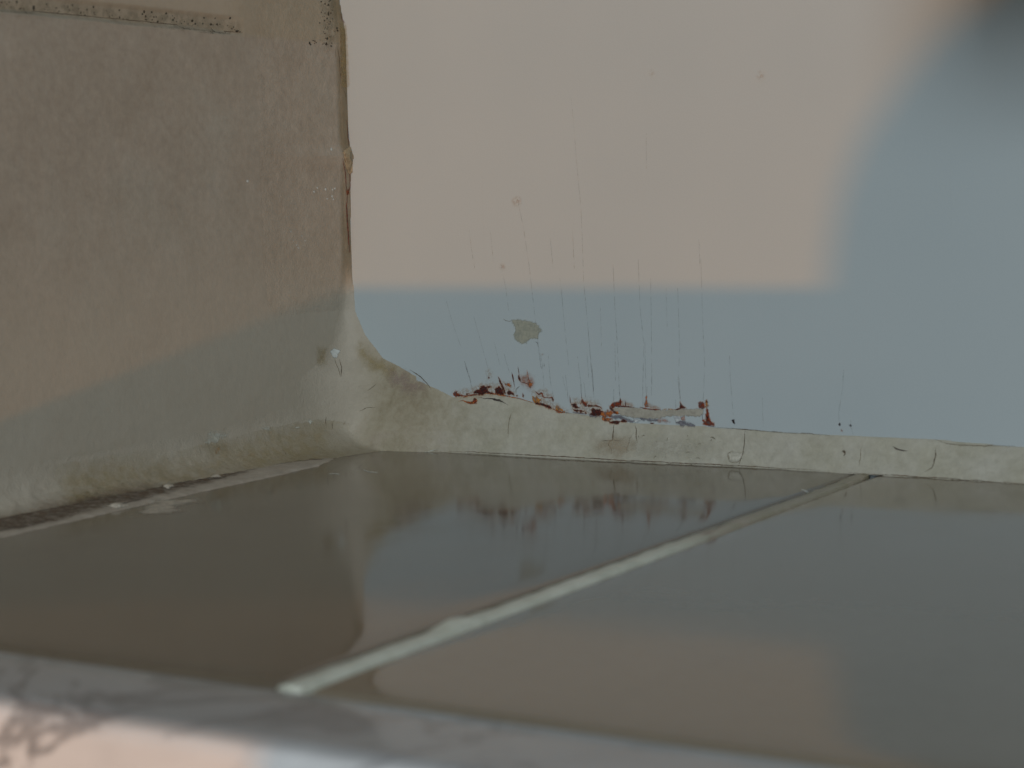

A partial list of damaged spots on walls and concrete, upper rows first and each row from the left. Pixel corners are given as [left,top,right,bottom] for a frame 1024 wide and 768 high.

peeling [504,319,541,344]
rust [453,369,714,427]
peeling [613,407,703,427]